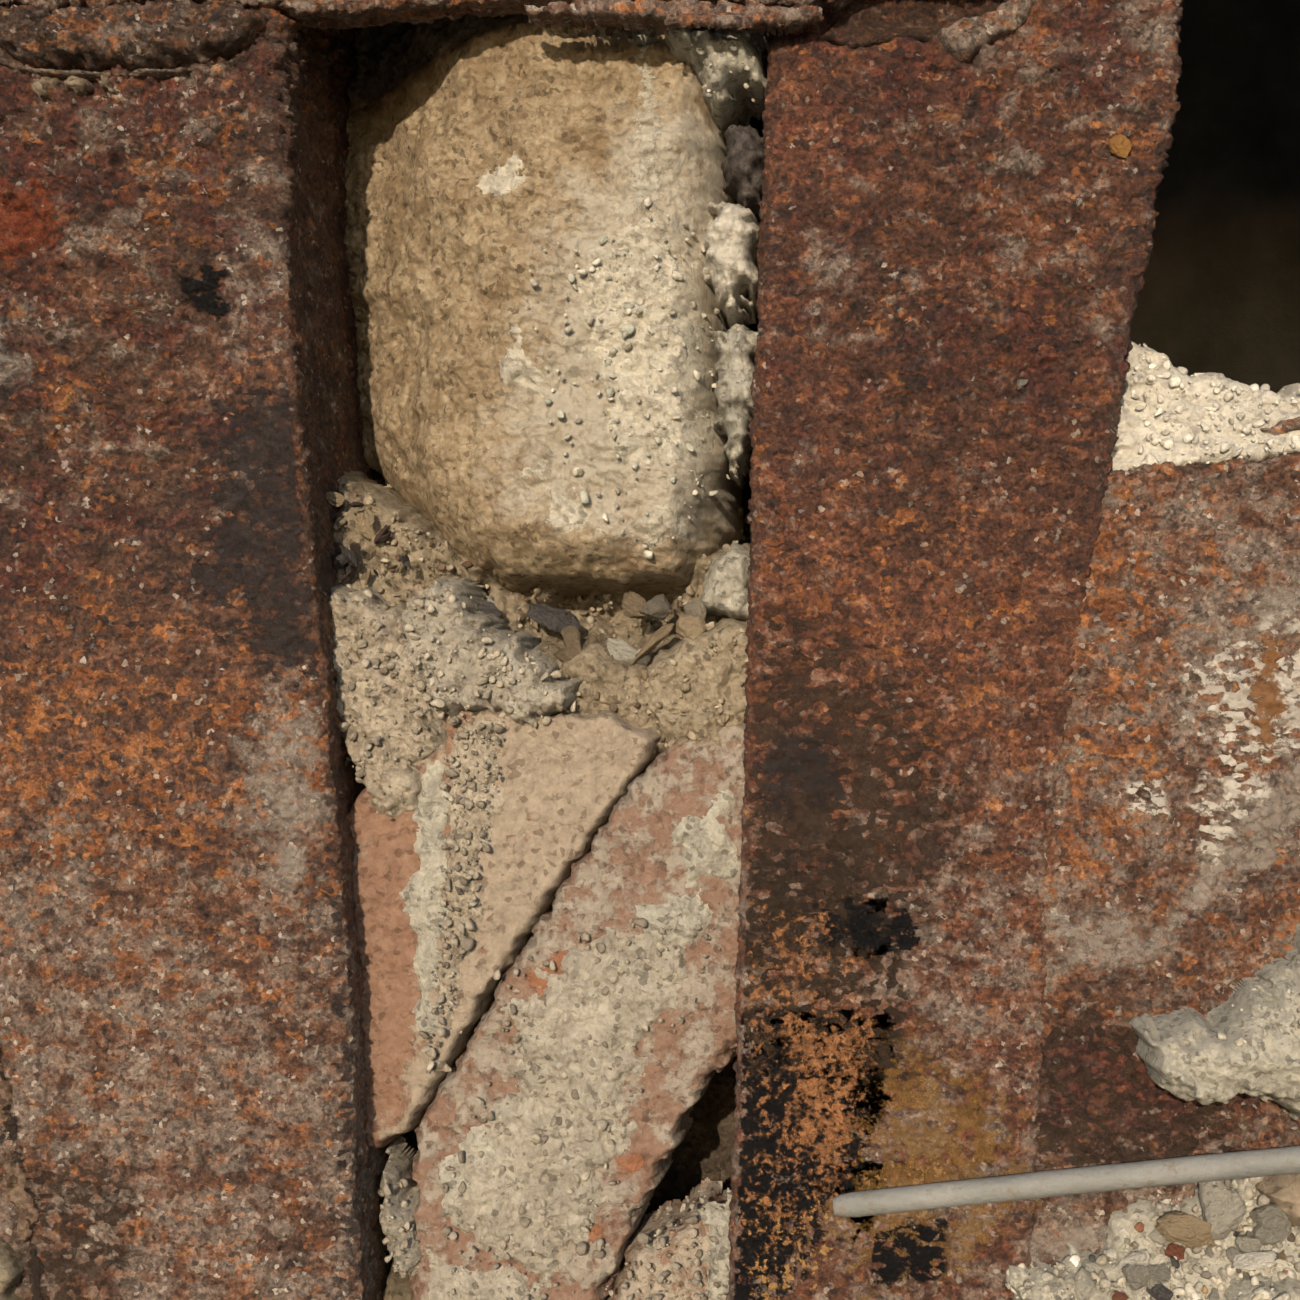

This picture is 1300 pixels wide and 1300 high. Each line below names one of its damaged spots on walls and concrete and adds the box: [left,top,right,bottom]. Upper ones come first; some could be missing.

rust [524,0,824,37]
rust [31,72,117,102]
rust [1108,134,1132,158]
rust [1243,635,1288,767]
peeling [634,789,948,1300]
rust [1034,996,1241,1168]
rust [863,1148,984,1189]